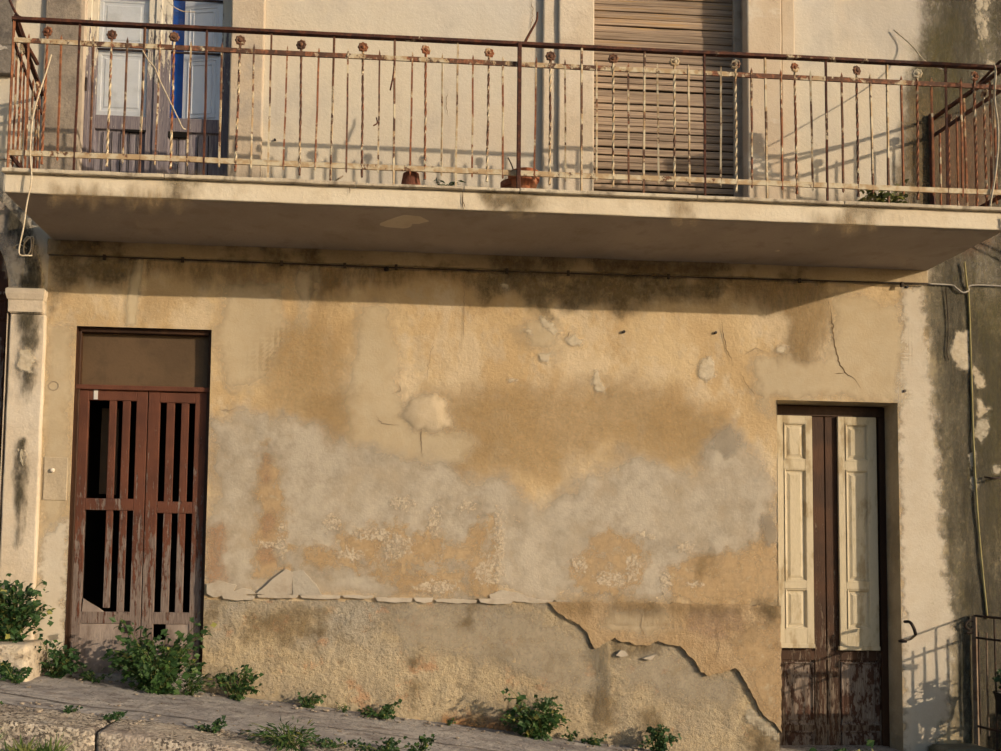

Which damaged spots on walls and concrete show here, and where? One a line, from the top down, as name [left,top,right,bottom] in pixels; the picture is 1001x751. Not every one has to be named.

leakage [895,0,1001,207]
leakage [17,312,39,391]
crack [828,302,860,387]
flaking render [950,331,990,441]
leakage [15,438,27,536]
leakage [921,233,1001,751]
flaking render [205,409,782,740]